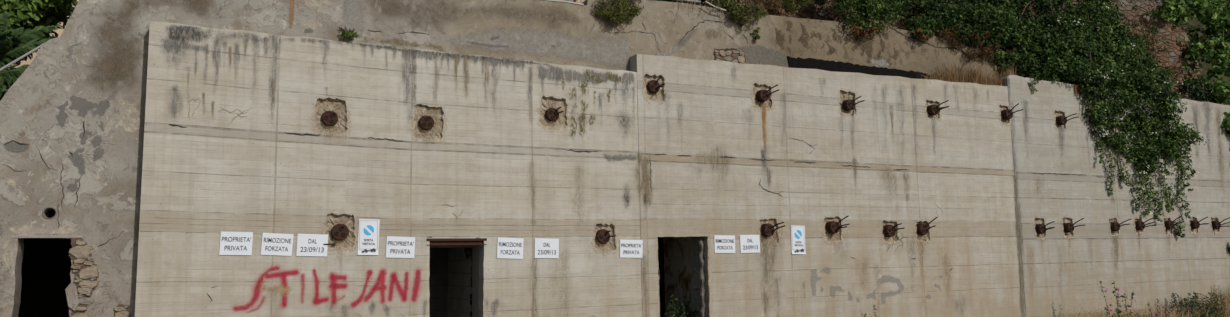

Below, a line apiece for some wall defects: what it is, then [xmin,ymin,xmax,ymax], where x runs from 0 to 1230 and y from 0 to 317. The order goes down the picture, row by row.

water stain [165,0,328,75]
crack [590,20,748,50]
water stain [347,35,634,135]
peeling [4,140,29,152]
peeling [56,96,140,191]